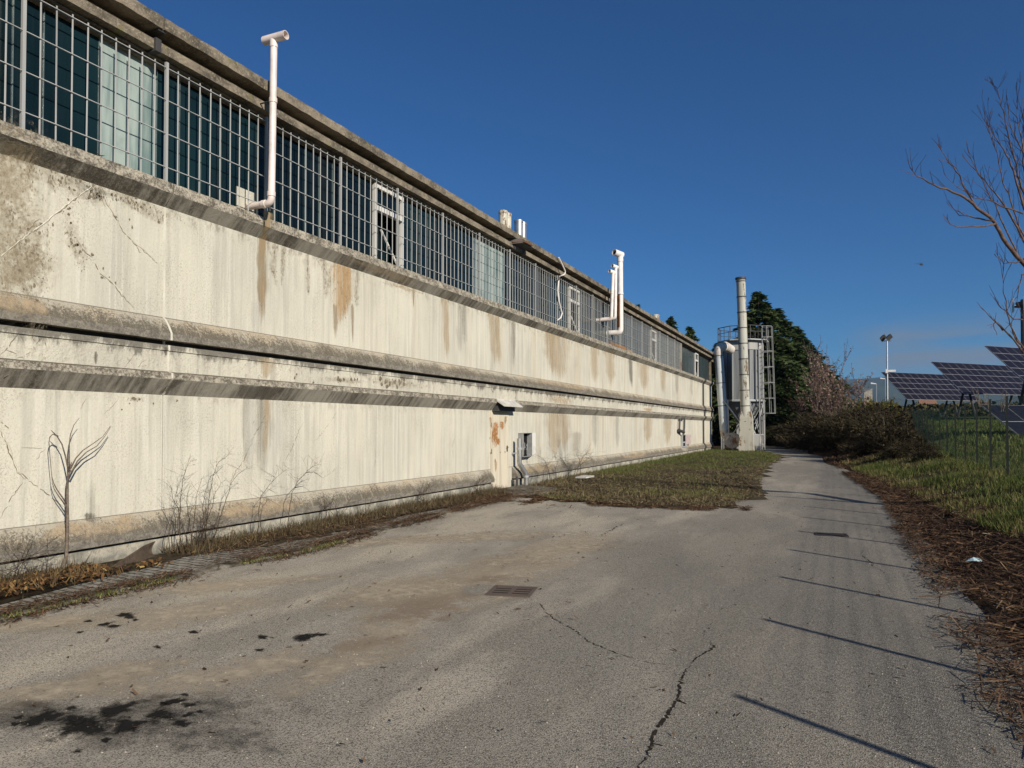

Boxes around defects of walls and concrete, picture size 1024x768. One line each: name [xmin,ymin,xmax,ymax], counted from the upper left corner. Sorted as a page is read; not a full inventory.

crack [1,187,157,263]
crack [76,236,135,308]
corrosion [333,264,353,333]
corrosion [490,416,507,470]
crack [531,599,715,768]